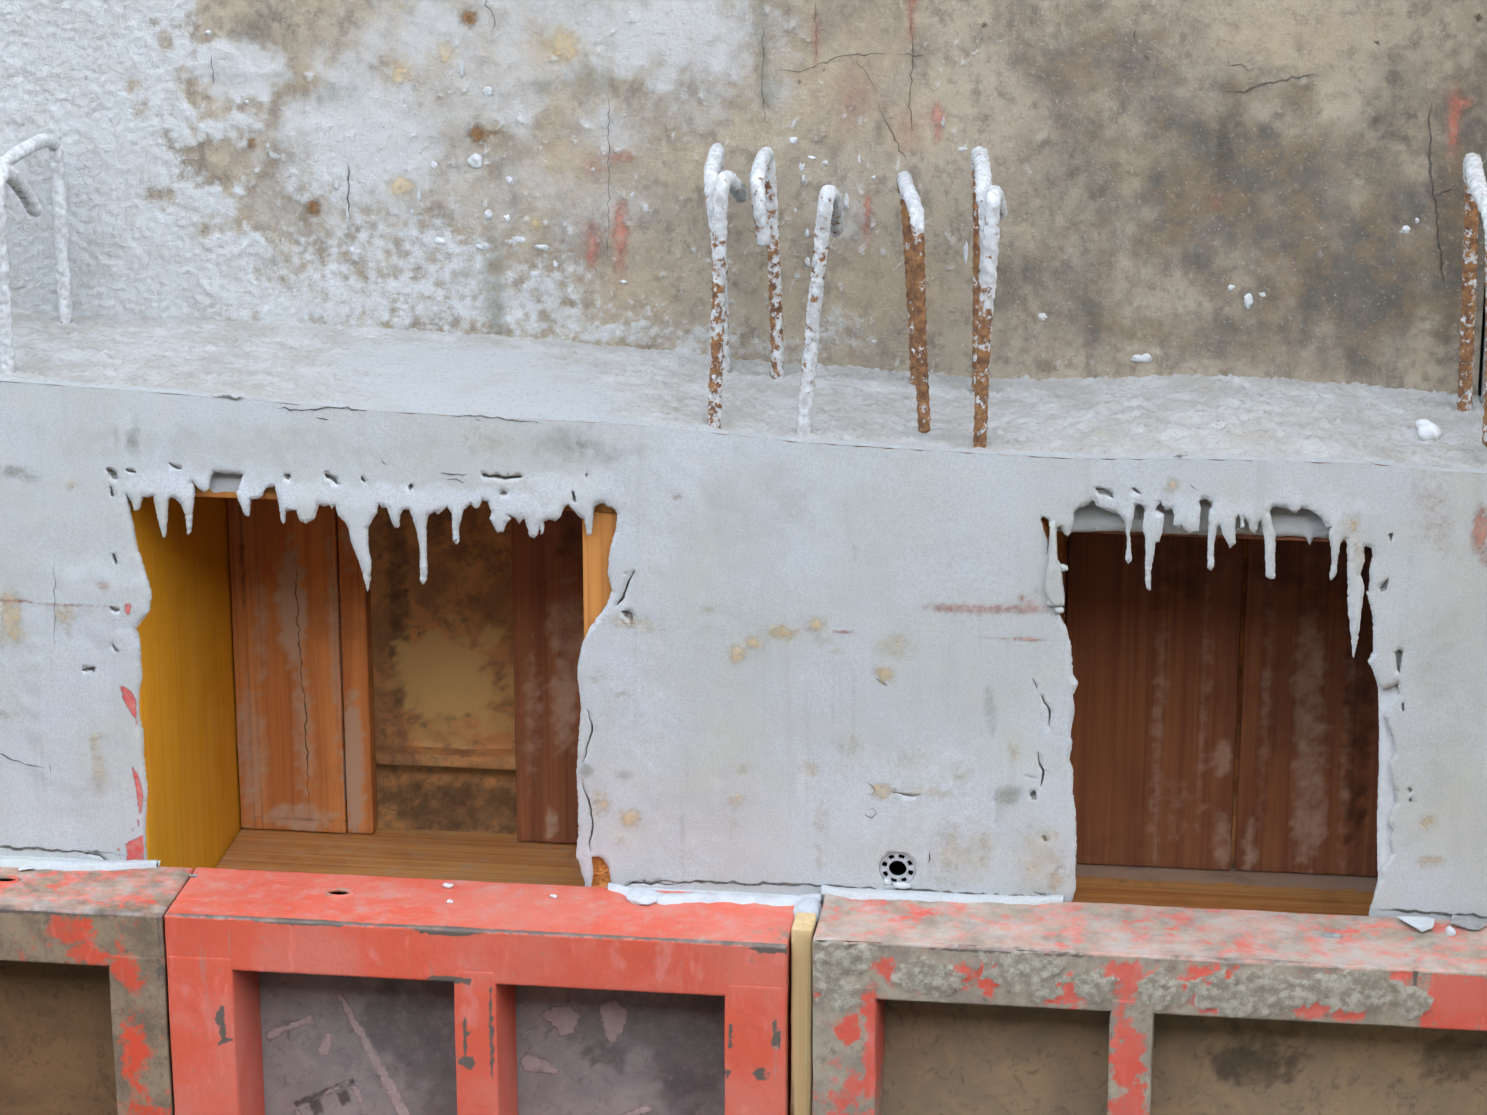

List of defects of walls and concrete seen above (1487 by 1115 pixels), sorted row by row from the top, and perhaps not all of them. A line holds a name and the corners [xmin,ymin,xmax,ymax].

crack [761,0,923,158]
spalling [106,469,136,496]
peeling [209,472,243,493]
spalling [482,473,522,496]
peeling [1041,488,1330,614]
peeling [121,686,137,724]
peeling [118,768,144,861]
spalling [591,856,611,887]